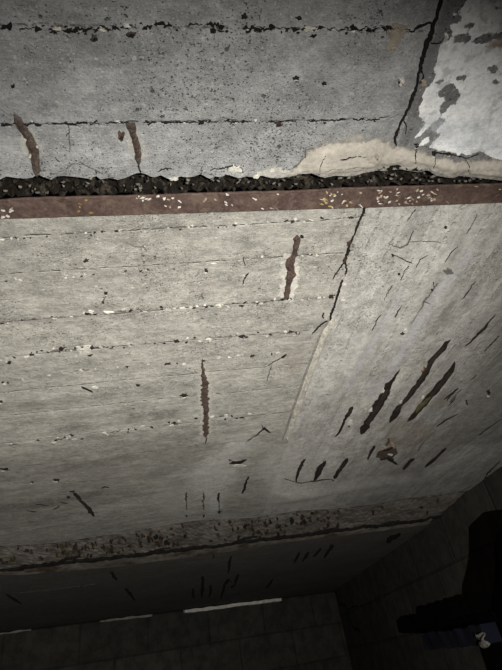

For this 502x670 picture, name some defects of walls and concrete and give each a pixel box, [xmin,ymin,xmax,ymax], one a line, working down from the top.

spalling [34,25,107,42]
spalling [123,22,148,38]
peeling [295,16,335,38]
crack [393,0,449,146]
peeling [414,0,502,160]
spalling [0,114,502,213]
crack [312,208,366,334]
spalling [335,368,405,437]
spalling [389,339,455,423]
spalling [314,461,326,481]
spalling [367,438,415,470]